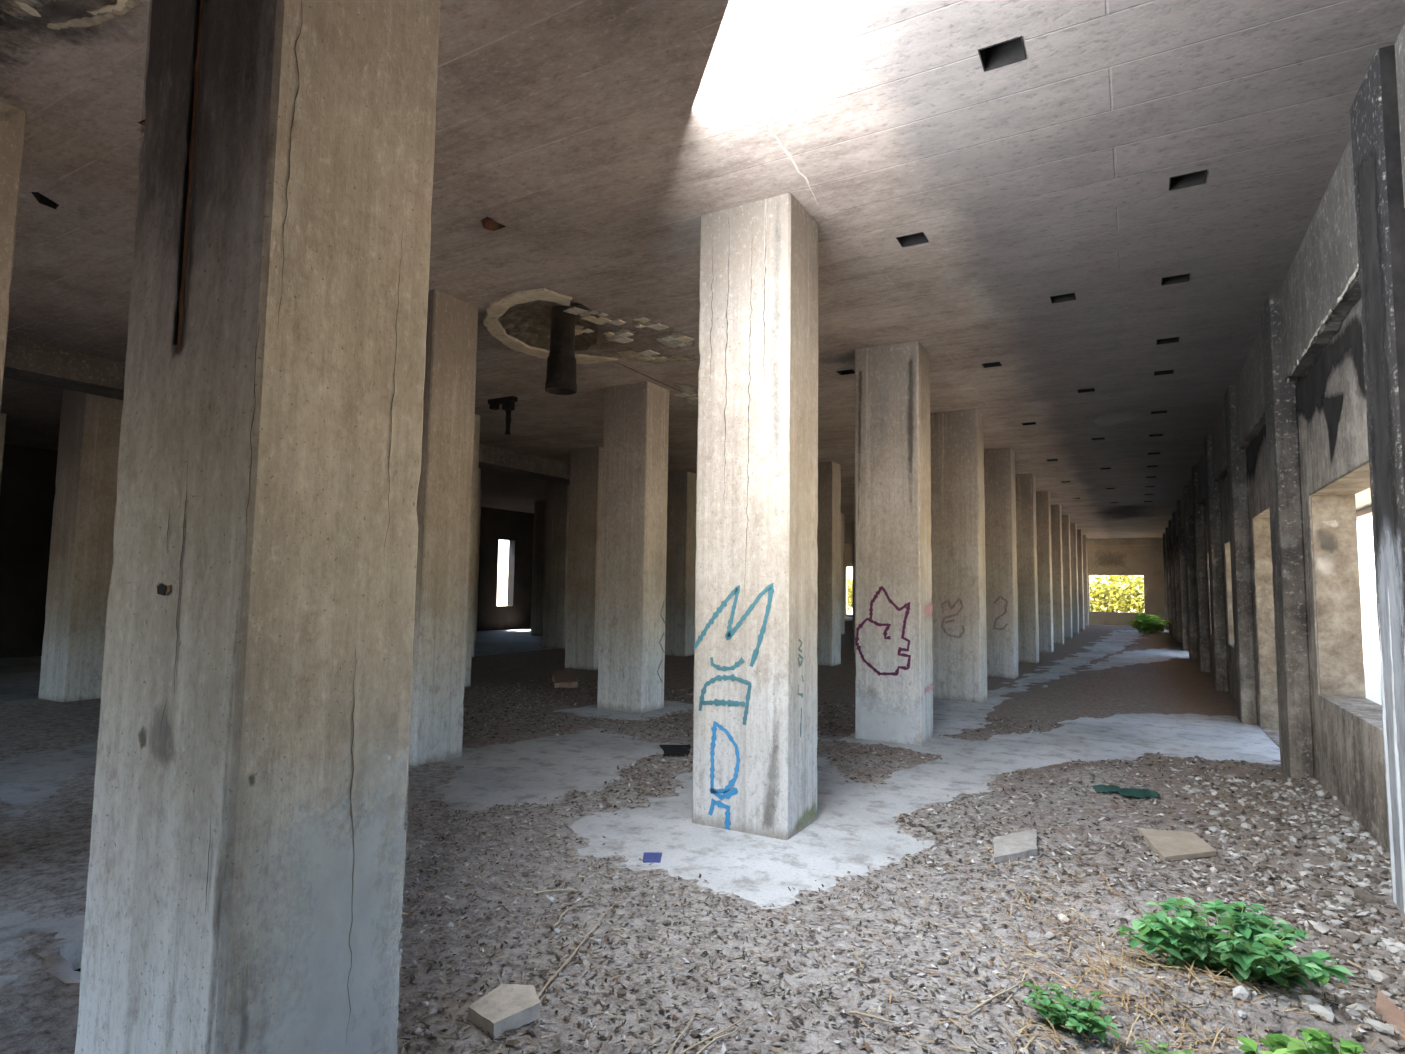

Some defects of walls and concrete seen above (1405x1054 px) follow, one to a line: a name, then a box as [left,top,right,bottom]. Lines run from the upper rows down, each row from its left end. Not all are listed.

peeling [15,0,138,30]
rust [171,0,207,356]
spalling [31,192,59,209]
spalling [483,288,695,364]
spalling [674,383,698,407]